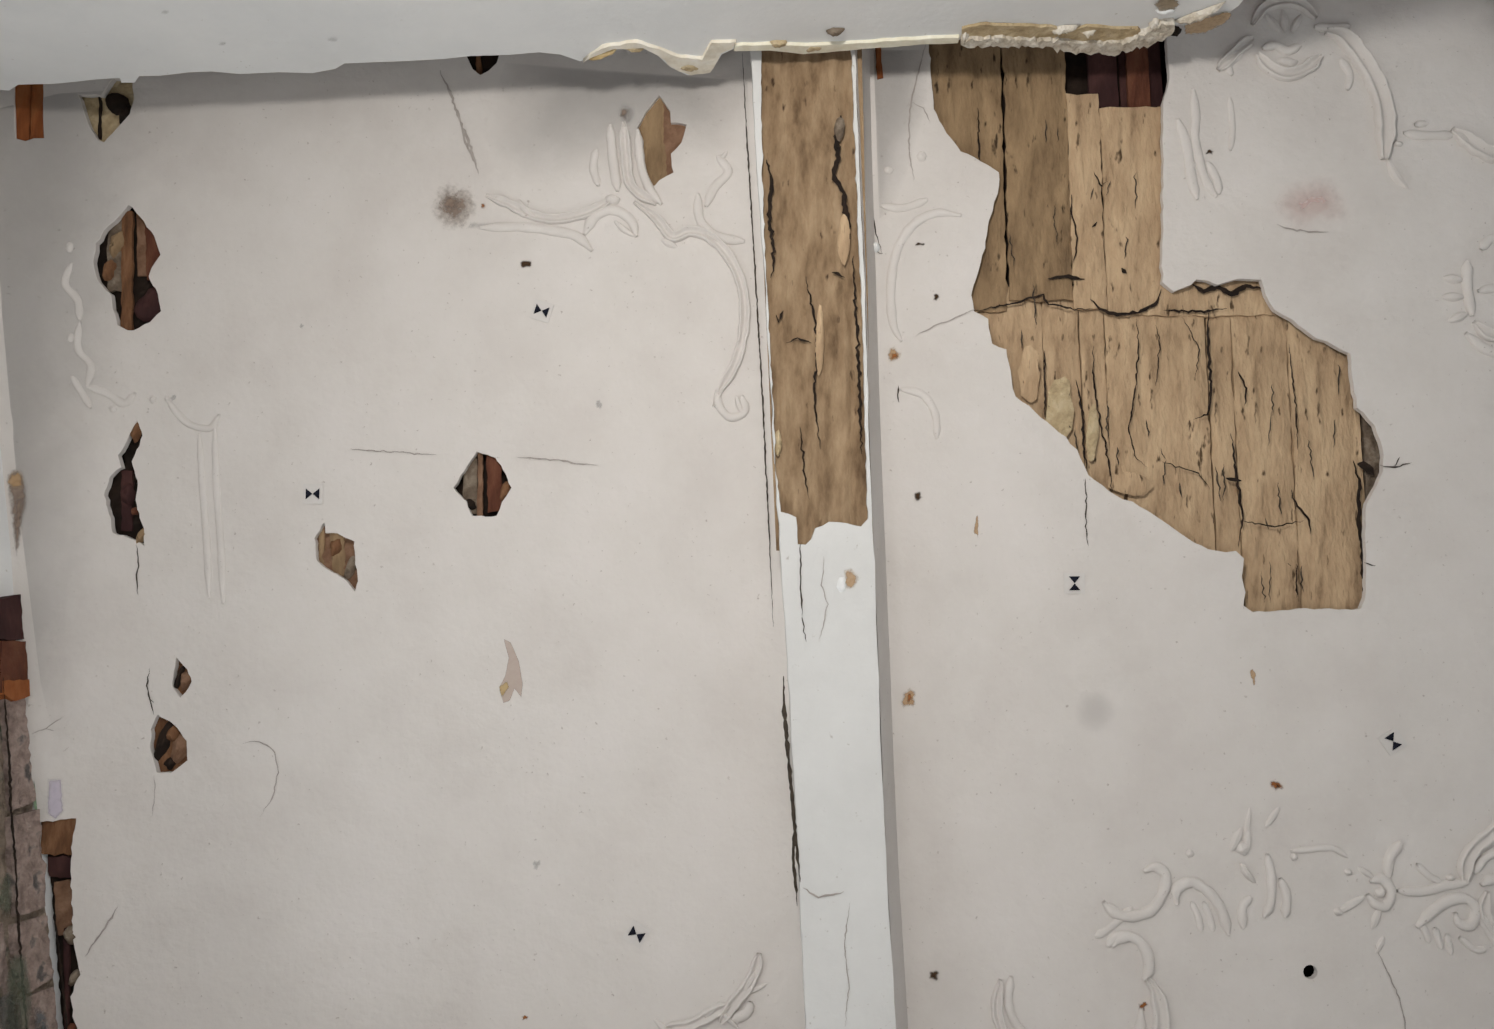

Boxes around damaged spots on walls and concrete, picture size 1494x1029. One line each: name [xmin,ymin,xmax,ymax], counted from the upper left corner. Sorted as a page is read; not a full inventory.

spalling [82,81,134,142]
spalling [97,208,161,330]
spalling [583,0,1380,612]
spalling [108,422,145,544]
spalling [455,452,511,517]
spalling [317,526,358,590]
spalling [154,717,187,772]
spalling [0,678,80,1029]
crack [781,676,850,1022]